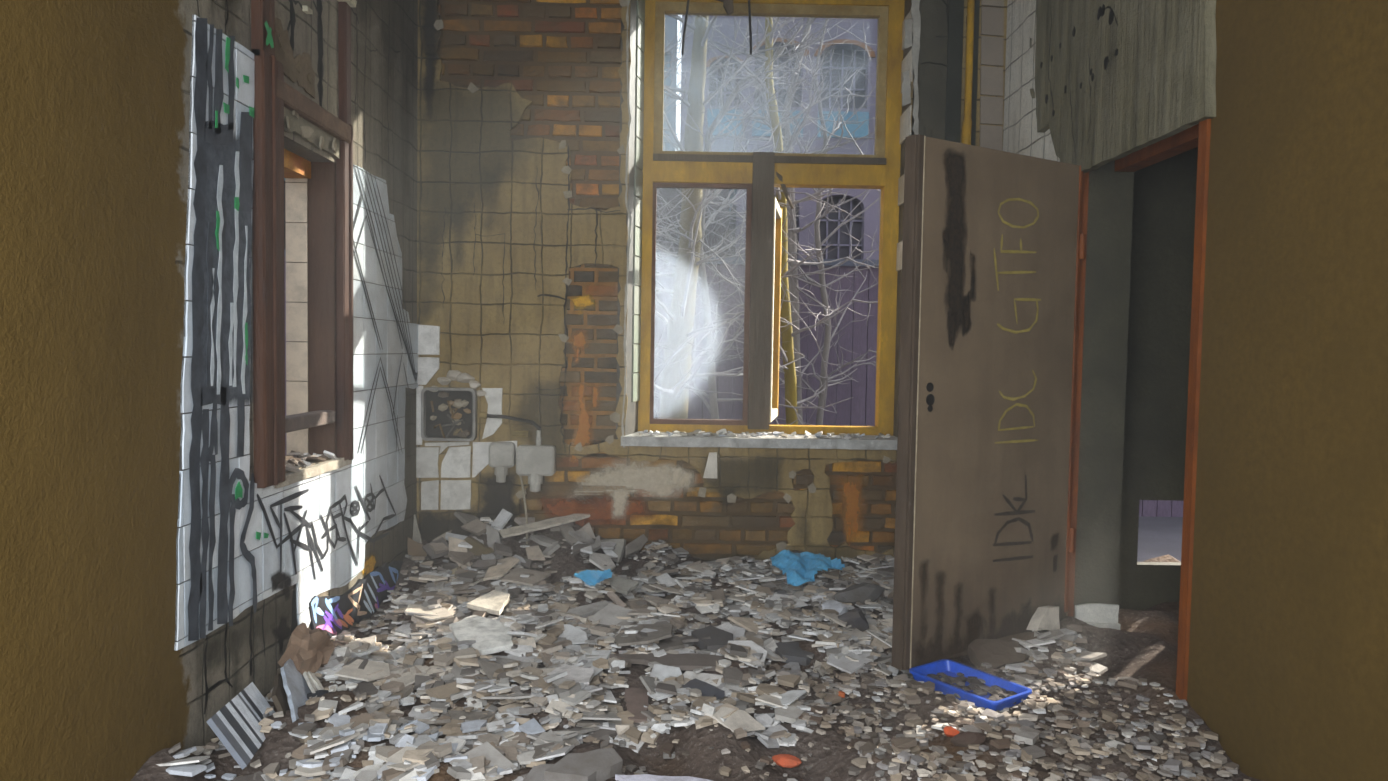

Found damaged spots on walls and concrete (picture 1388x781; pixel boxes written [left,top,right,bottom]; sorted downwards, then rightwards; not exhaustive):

spalling [434,0,628,211]
spalling [429,370,487,396]
spalling [516,264,897,561]